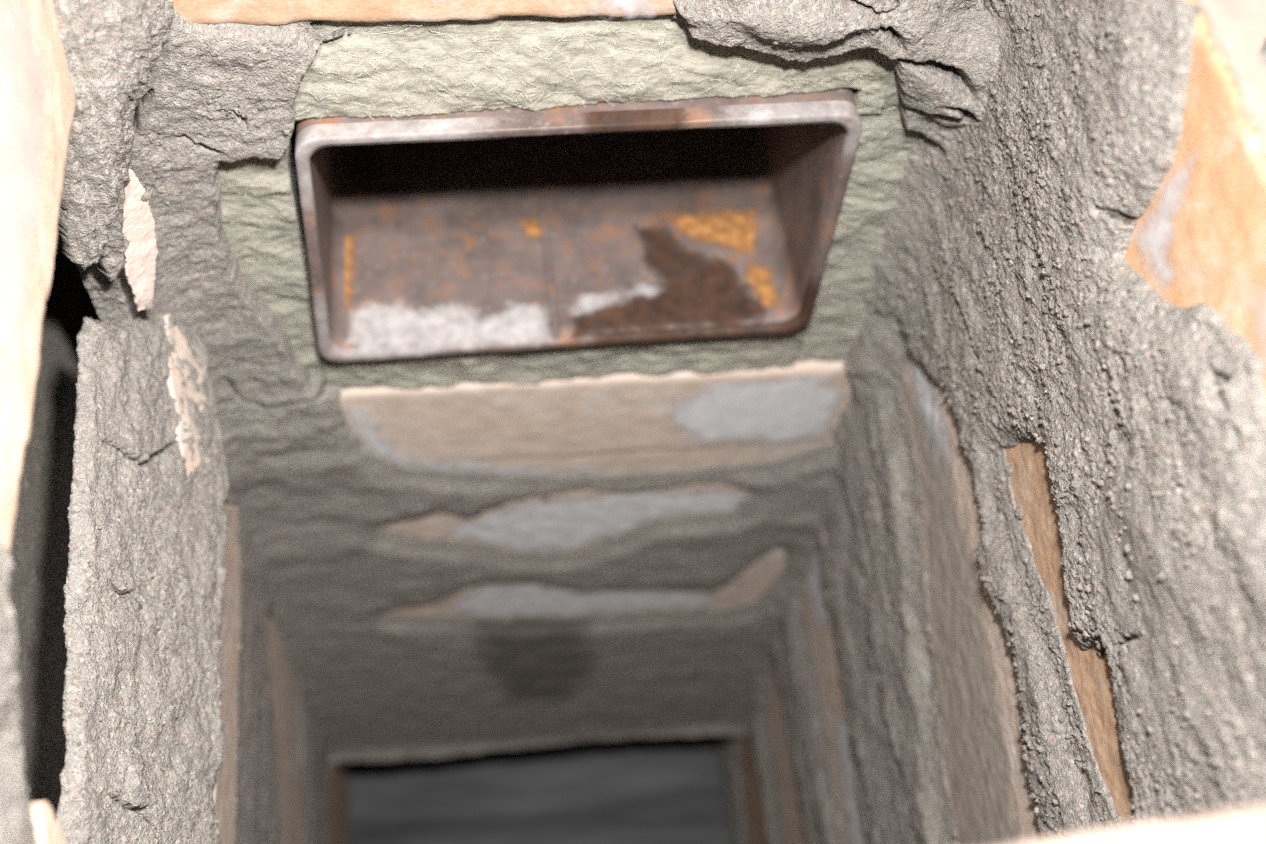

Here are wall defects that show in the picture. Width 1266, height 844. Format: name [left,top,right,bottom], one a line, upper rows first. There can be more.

crack [984,0,1005,19]
crack [843,0,974,110]
corrosion [588,108,682,135]
corrosion [522,220,542,237]
corrosion [345,236,354,303]
corrosion [574,210,819,346]
spalling [379,482,751,553]
spalling [384,547,786,620]
spalling [1005,441,1134,820]